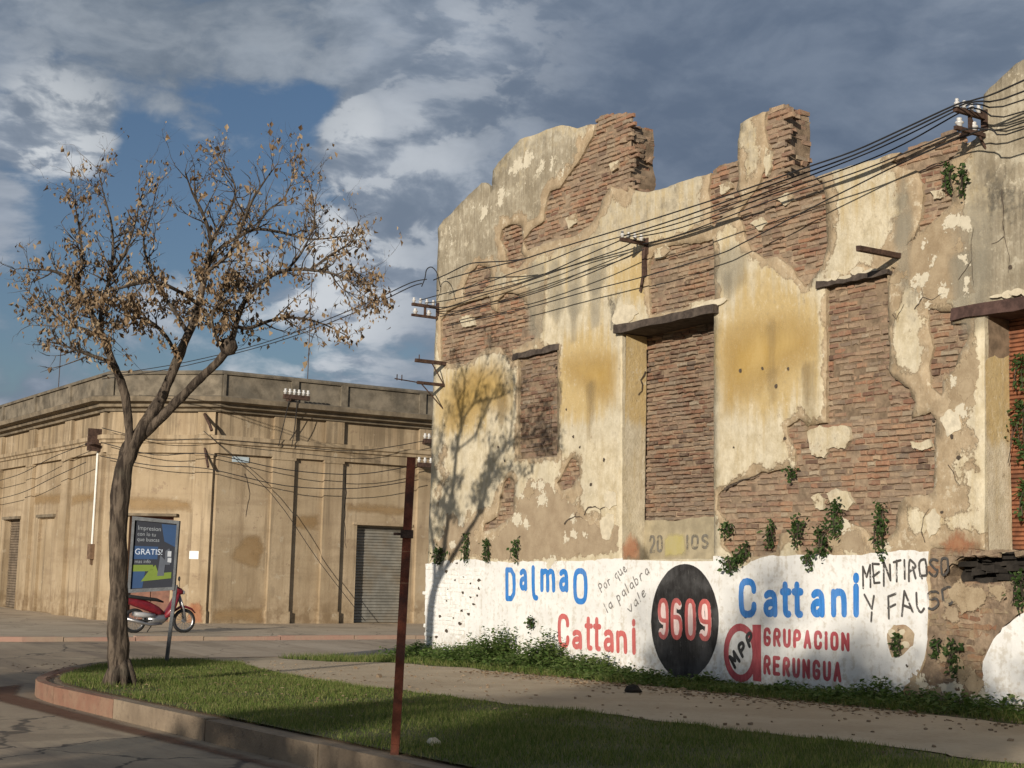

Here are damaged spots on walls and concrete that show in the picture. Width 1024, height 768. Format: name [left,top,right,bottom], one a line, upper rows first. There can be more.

damp [452,372,506,419]
flaking render [442,265,536,364]
flaking render [435,435,619,638]
flaking render [472,112,656,269]
crack [724,473,761,491]
damp [727,328,804,401]
flaking render [710,104,828,286]
flaking render [719,317,936,557]
flaking render [889,129,980,419]
spalling [887,548,1024,707]